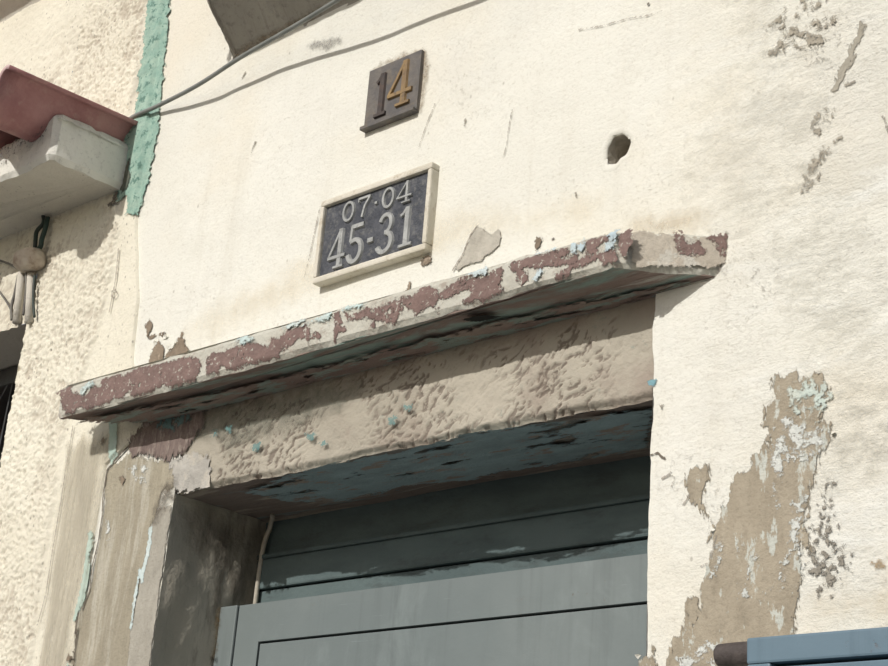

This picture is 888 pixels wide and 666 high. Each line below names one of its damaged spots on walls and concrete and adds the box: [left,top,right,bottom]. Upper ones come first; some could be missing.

spalling [765,0,837,56]
spalling [830,21,867,93]
spalling [800,107,842,194]
peeling [57,226,729,666]
peeling [635,369,853,666]